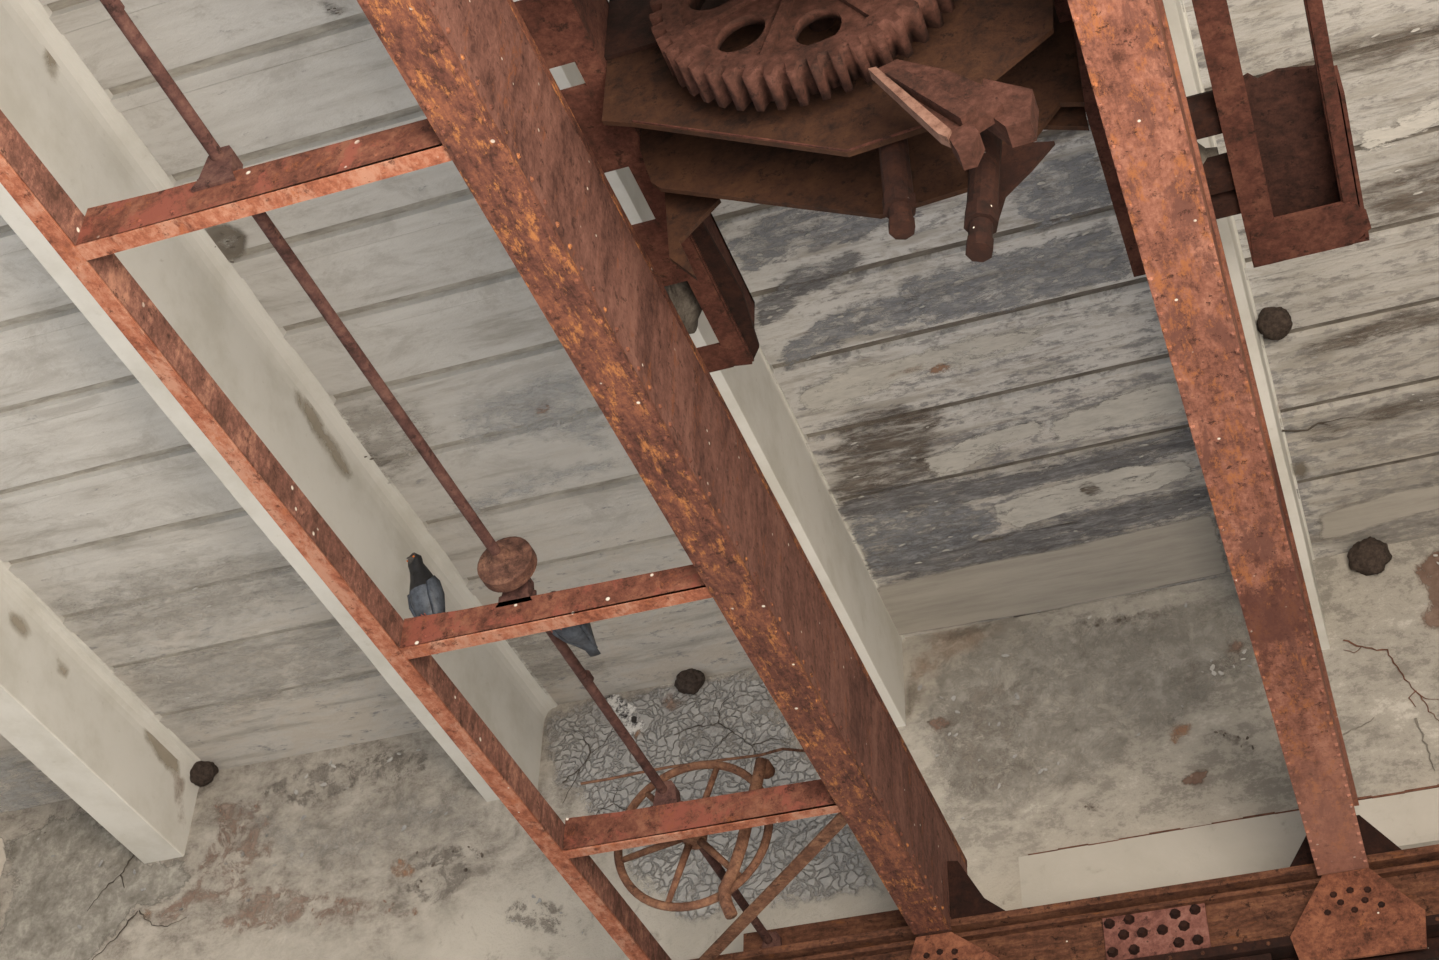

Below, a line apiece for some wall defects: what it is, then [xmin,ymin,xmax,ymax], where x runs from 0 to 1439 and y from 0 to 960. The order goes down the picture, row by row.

peeling [1363,160,1439,226]
peeling [727,209,889,326]
peeling [778,153,1130,369]
peeling [1311,309,1439,358]
peeling [1313,392,1439,441]
peeling [799,323,1227,635]
peeling [1320,485,1439,539]
peeling [1414,551,1439,628]
crack [1343,640,1439,800]
crack [87,854,186,960]
spalling [0,749,425,960]
crack [1028,809,1299,855]